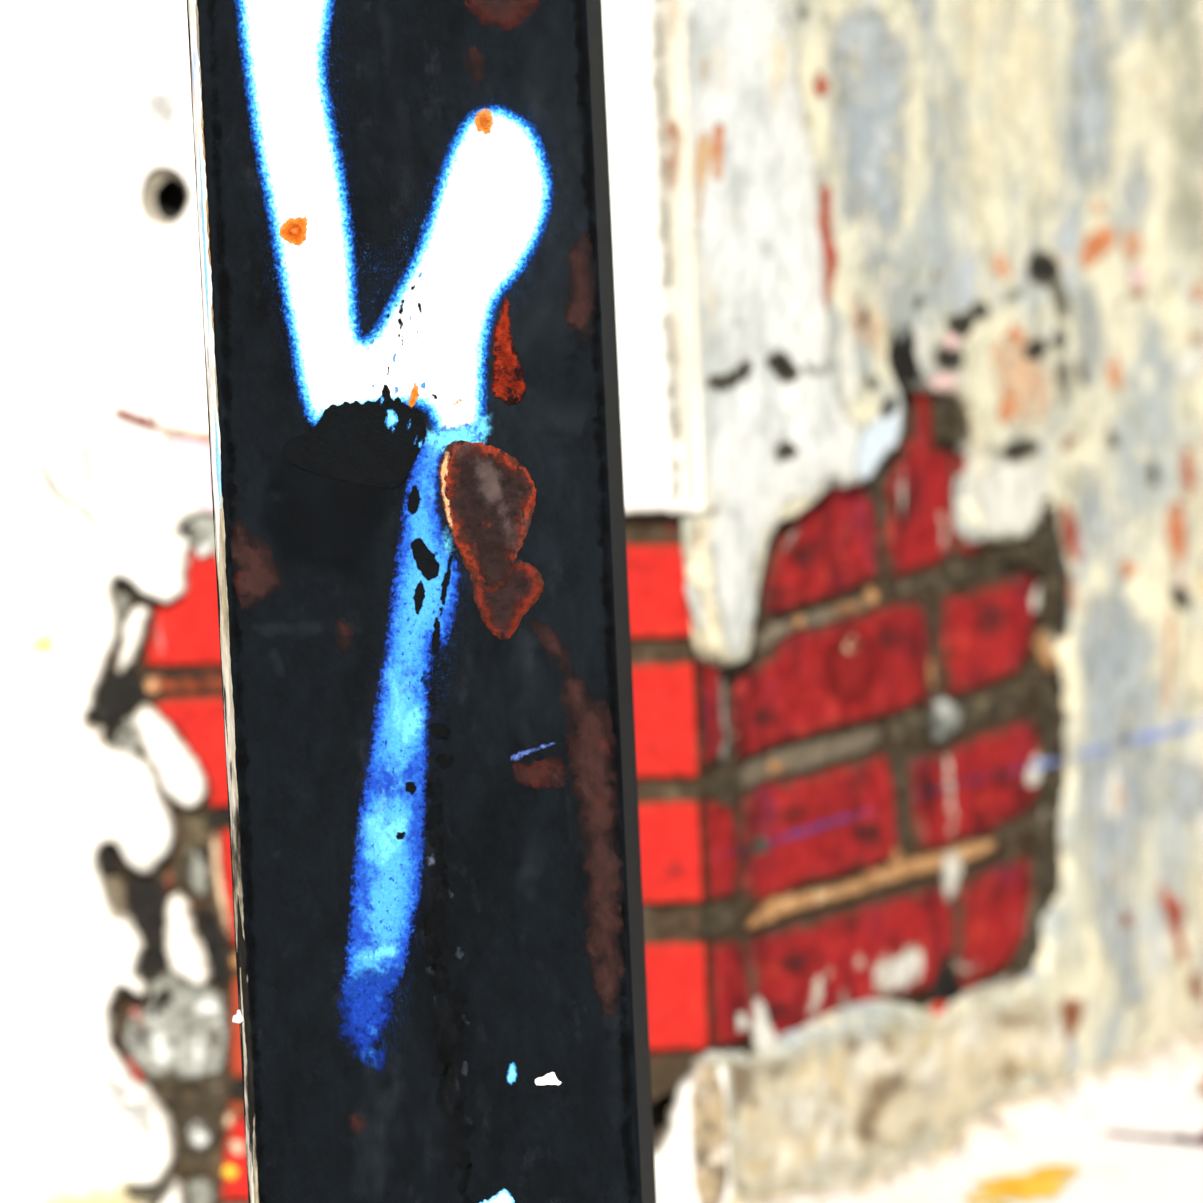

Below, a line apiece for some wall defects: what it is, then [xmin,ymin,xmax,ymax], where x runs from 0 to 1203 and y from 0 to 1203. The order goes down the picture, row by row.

corrosion [465,0,538,29]
spalling [89,437,249,1203]
corrosion [491,298,526,405]
corrosion [438,440,626,1015]
spalling [625,0,1067,1101]